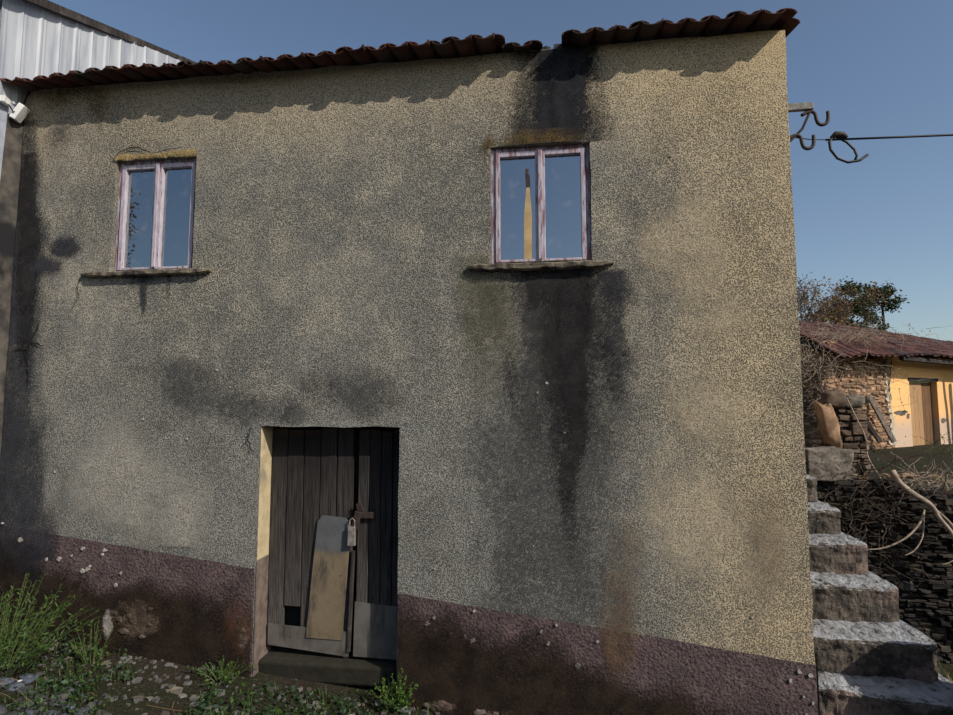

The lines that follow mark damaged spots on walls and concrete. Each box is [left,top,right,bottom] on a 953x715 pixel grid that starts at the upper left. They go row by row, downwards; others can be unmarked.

water stain [548,47,592,143]
water stain [646,204,718,262]
water stain [0,120,251,678]
water stain [398,268,741,715]
spalling [103,599,160,639]